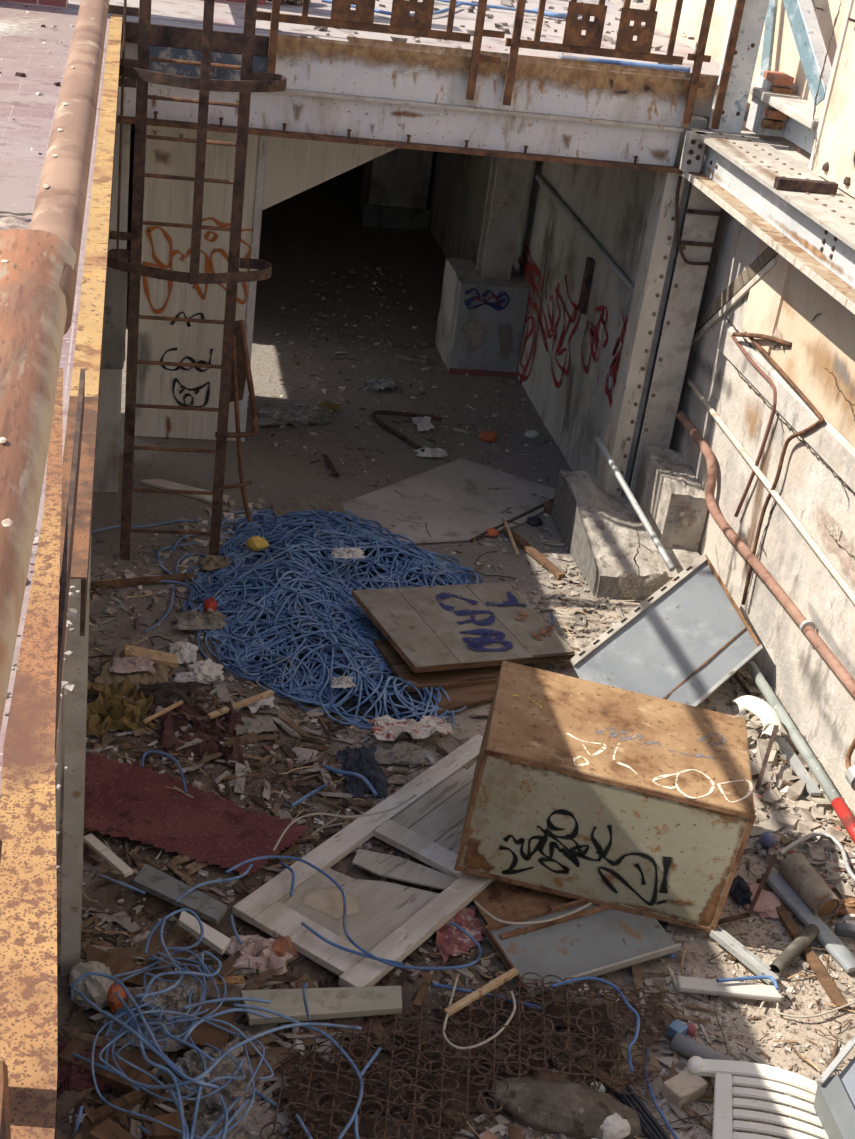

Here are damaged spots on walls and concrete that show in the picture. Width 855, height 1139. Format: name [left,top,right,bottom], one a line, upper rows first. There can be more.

corrosion [268,33,719,106]
crack [0,211,33,227]